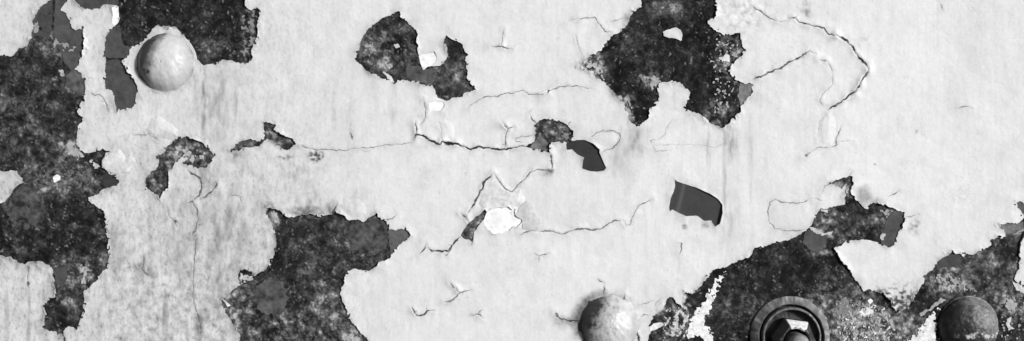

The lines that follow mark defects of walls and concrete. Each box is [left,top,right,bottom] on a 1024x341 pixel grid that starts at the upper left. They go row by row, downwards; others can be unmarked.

peeling [419,52,437,68]
crack [754,7,868,157]
crack [302,85,580,151]
peeling [102,149,135,175]
peeling [566,140,606,172]
crack [422,155,553,256]
crack [523,201,648,255]
peeling [669,180,722,226]
rust [648,176,1024,341]